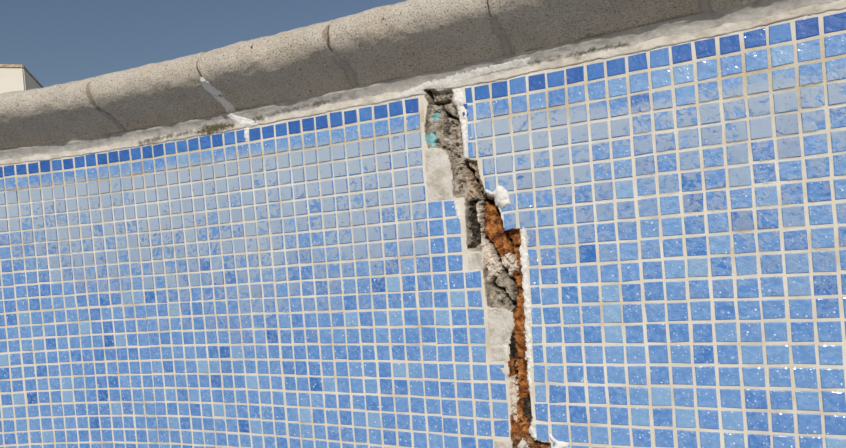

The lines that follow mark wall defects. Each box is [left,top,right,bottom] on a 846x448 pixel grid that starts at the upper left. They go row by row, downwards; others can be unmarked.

crack [327,26,358,87]
crack [482,0,512,56]
crack [196,60,259,128]
peeling [424,147,454,202]
peeling [487,308,515,379]